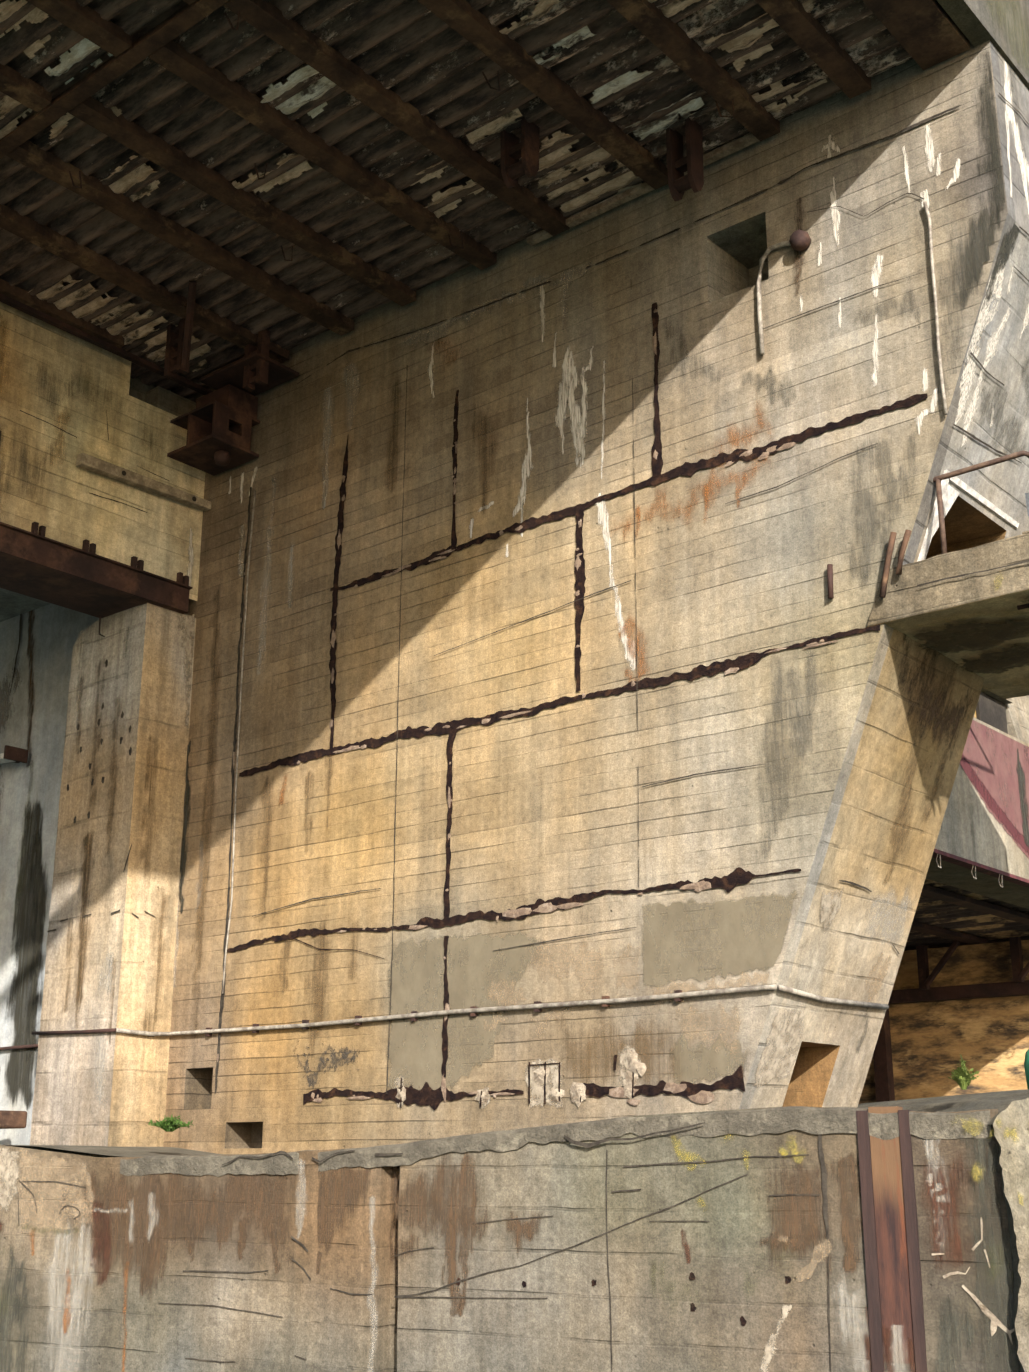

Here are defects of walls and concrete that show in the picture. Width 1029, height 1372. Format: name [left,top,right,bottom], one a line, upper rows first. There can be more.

spalling [0,0,113,84]
spalling [261,65,336,119]
spalling [537,131,642,214]
leakage [925,124,960,189]
leakage [948,52,1029,452]
leakage [412,277,636,670]
crack [953,424,1022,463]
crack [227,302,928,1110]
leakage [5,802,47,1108]
corrosion [90,1202,127,1285]
crack [158,1065,831,1372]
corrosion [865,1313,916,1372]